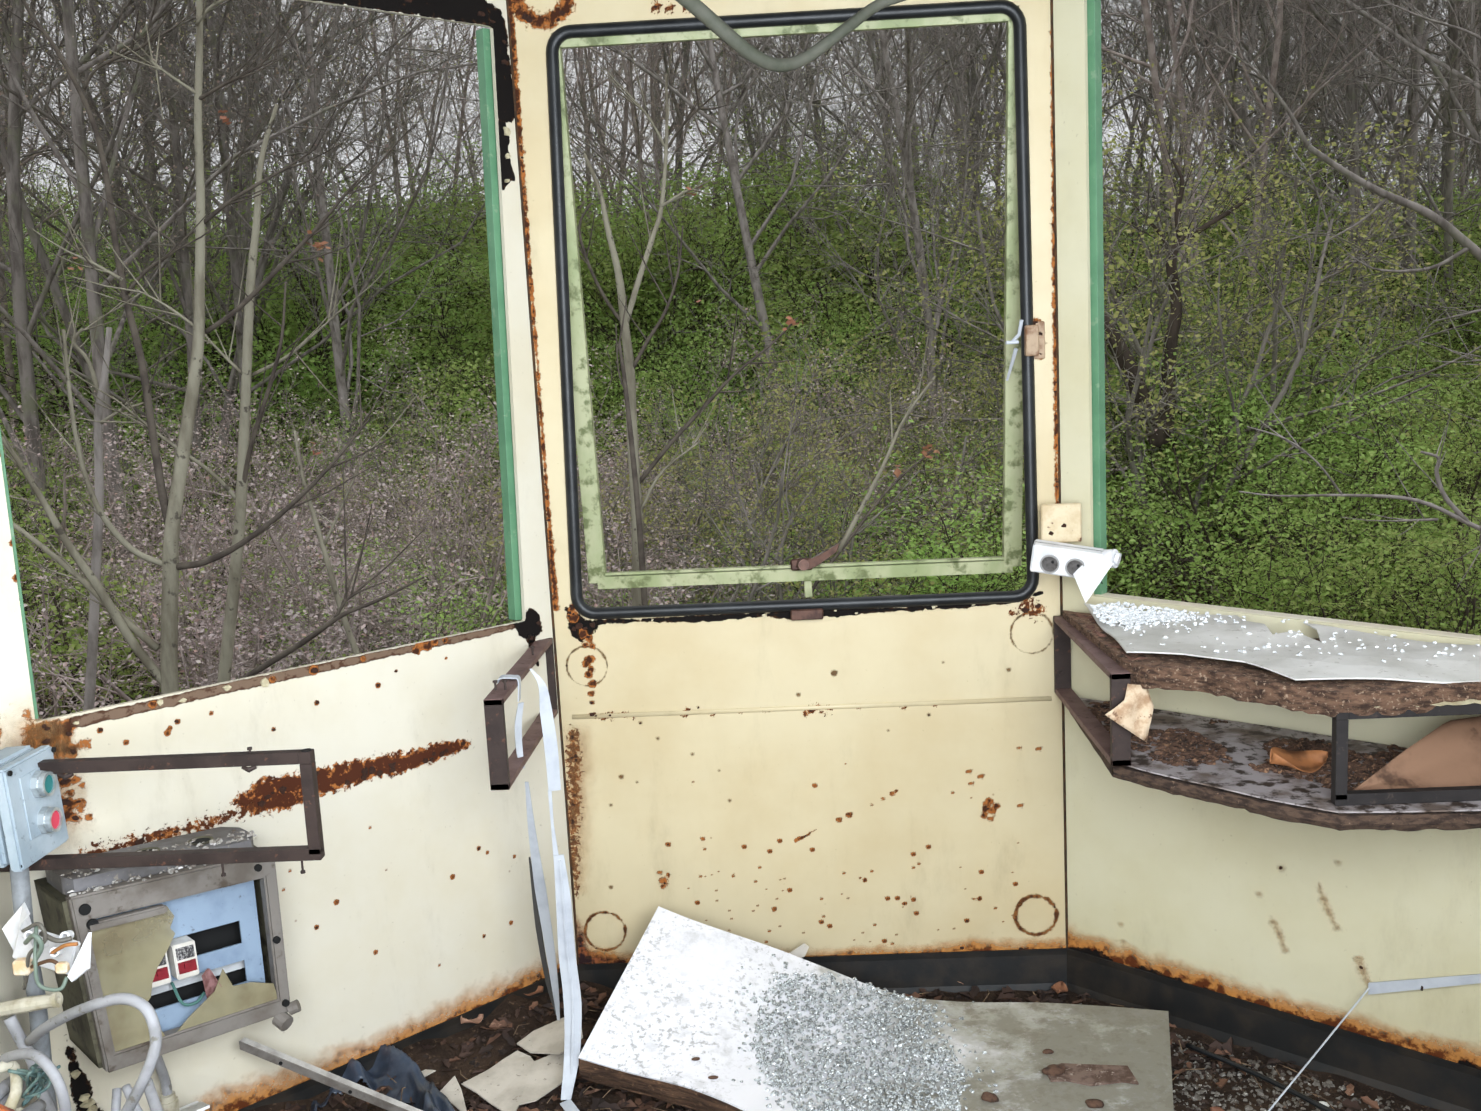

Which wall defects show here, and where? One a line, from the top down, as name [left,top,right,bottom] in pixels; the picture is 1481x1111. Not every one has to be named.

corrosion [651,0,690,14]
peeling [498,120,515,190]
corrosion [1033,31,1059,504]
corrosion [312,0,641,897]
corrosion [1009,597,1054,654]
corrosion [21,709,103,826]
corrosion [78,739,474,854]
corrosion [951,769,1023,822]
corrosion [576,911,632,965]
corrosion [752,838,793,943]
corrosion [805,872,1481,1070]
corrosion [205,964,560,1111]